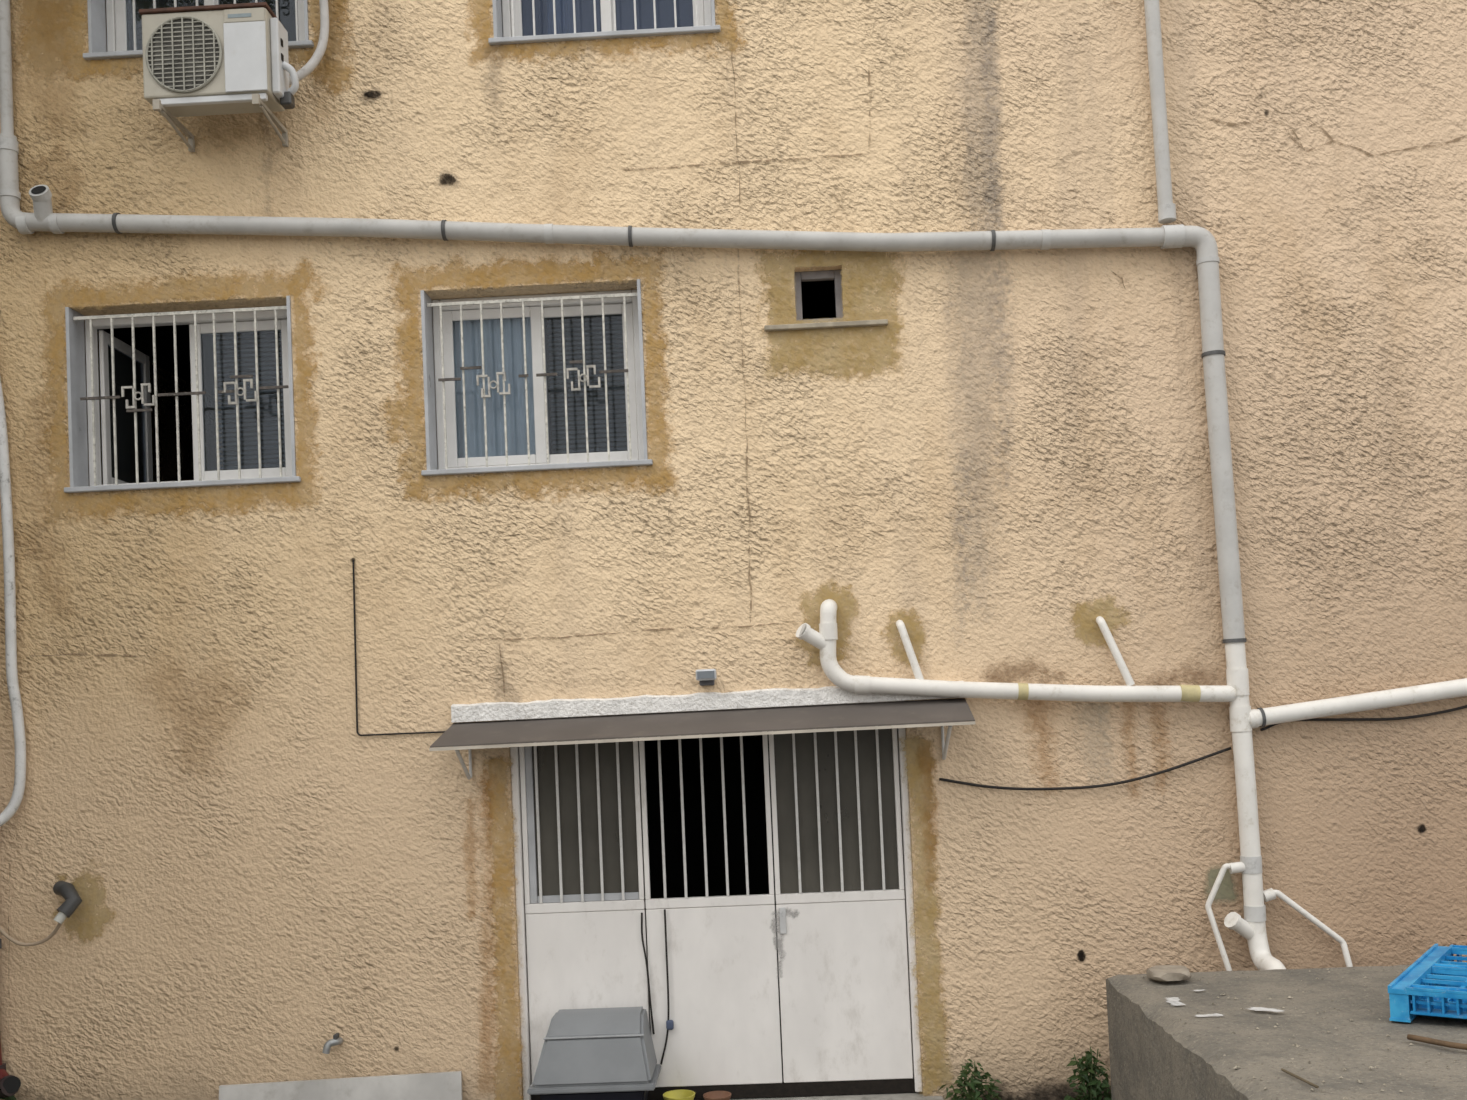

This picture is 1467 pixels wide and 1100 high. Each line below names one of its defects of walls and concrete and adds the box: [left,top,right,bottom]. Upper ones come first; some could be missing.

crack [1211,119,1466,164]